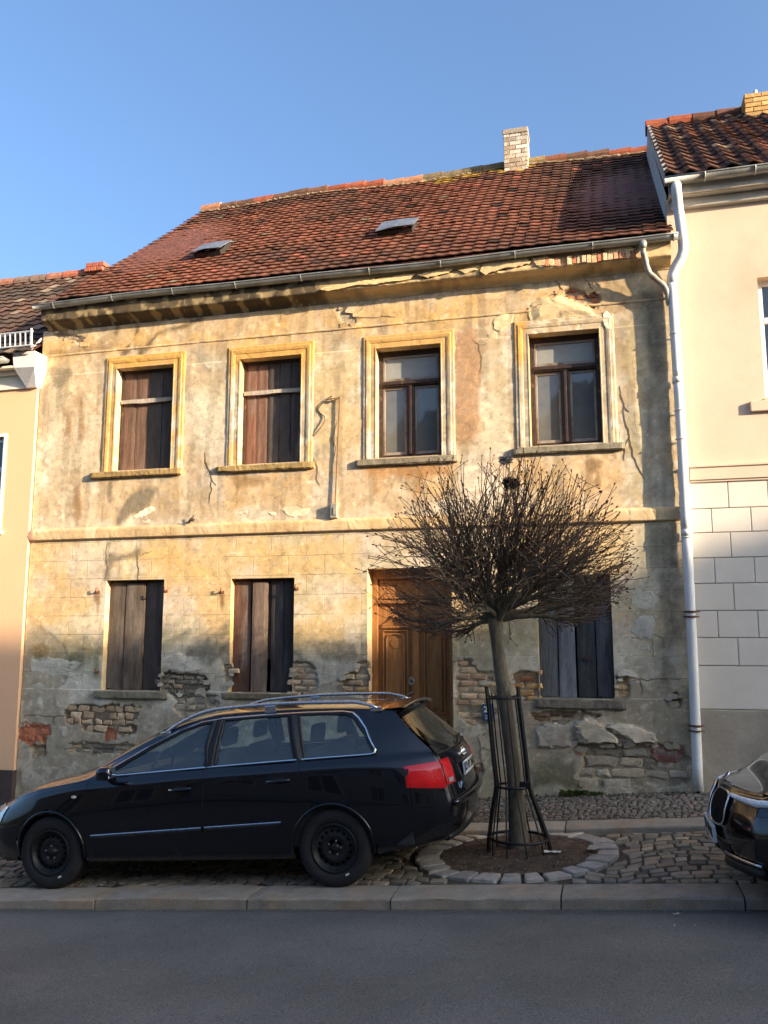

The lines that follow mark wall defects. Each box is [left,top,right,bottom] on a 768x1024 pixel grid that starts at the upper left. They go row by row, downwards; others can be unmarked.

peeling [321,246,636,291]
crack [619,386,645,480]
crack [204,452,216,503]
flaking render [155,653,240,719]
flaking render [287,661,319,695]
flaking render [336,660,373,698]
flaking render [452,657,499,726]
flaking render [18,722,51,758]
flaking render [64,703,141,757]
flaking render [510,670,692,790]